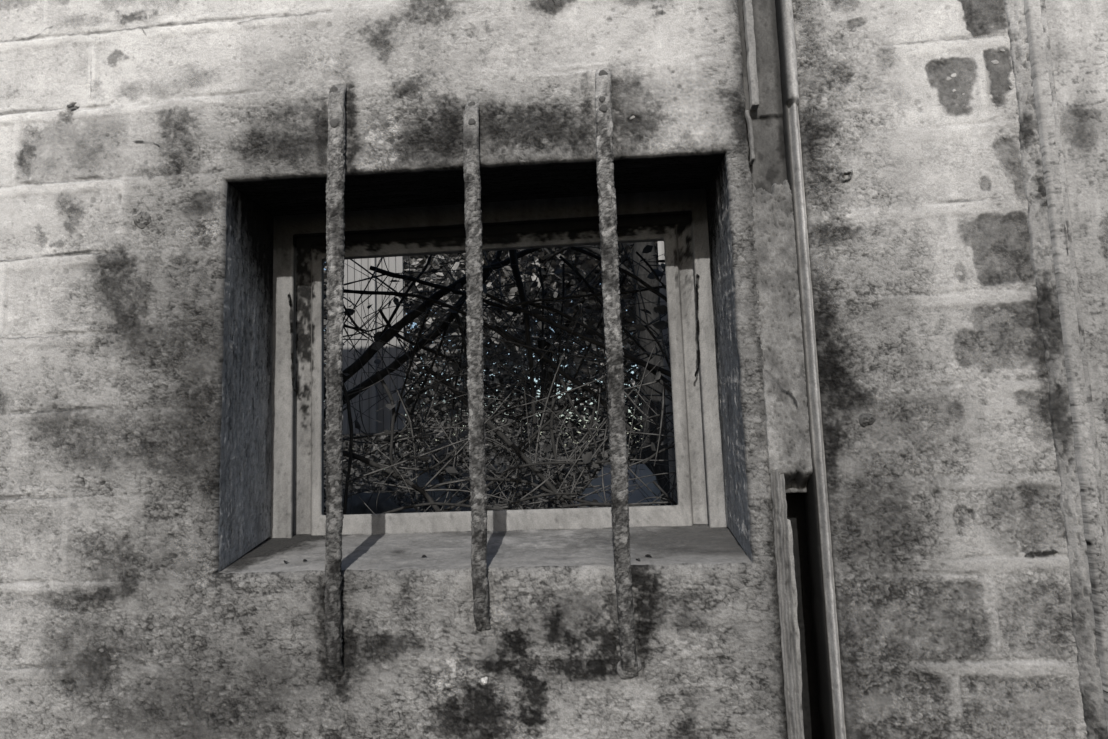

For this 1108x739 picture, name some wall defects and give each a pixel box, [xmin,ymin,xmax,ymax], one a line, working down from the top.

leakage [17,131,36,171]
leakage [98,249,217,370]
leakage [184,178,327,371]
leakage [293,232,327,426]
leakage [344,84,465,212]
leakage [344,224,466,252]
leakage [480,99,599,203]
leakage [482,216,600,245]
leakage [611,75,726,284]
leakage [815,259,871,491]
leakage [1019,116,1034,146]
leakage [1033,286,1073,442]